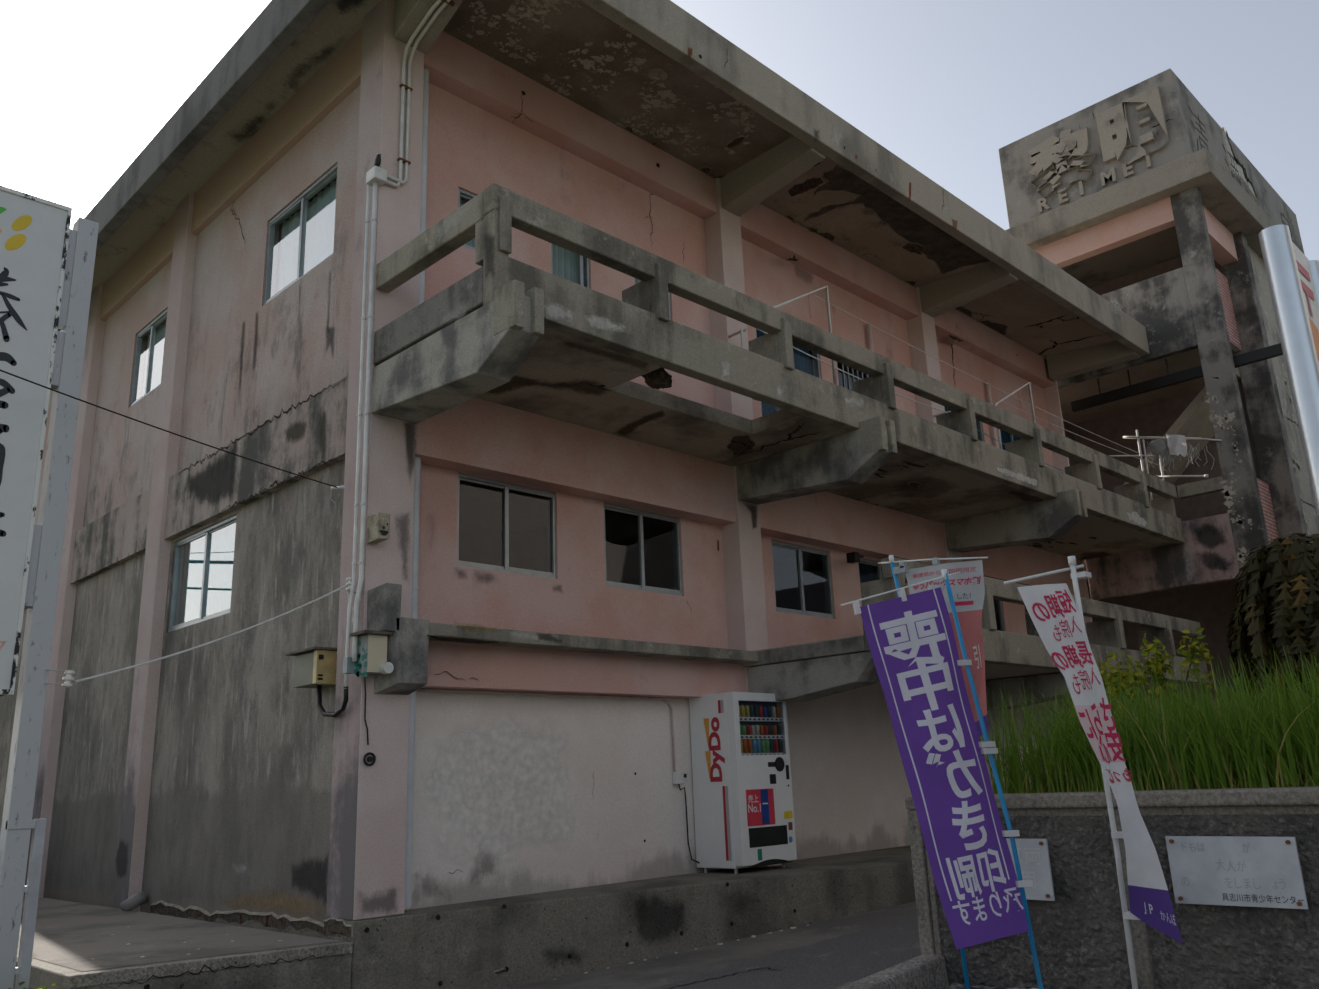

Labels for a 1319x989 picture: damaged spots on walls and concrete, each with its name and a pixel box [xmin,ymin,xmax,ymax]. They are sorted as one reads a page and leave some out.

peeling [457,0,756,178]
peeling [1222,127,1258,200]
peeling [785,165,991,274]
spalling [955,306,1009,335]
damp [187,442,237,504]
peeling [1205,377,1252,529]
spalling [150,900,353,940]